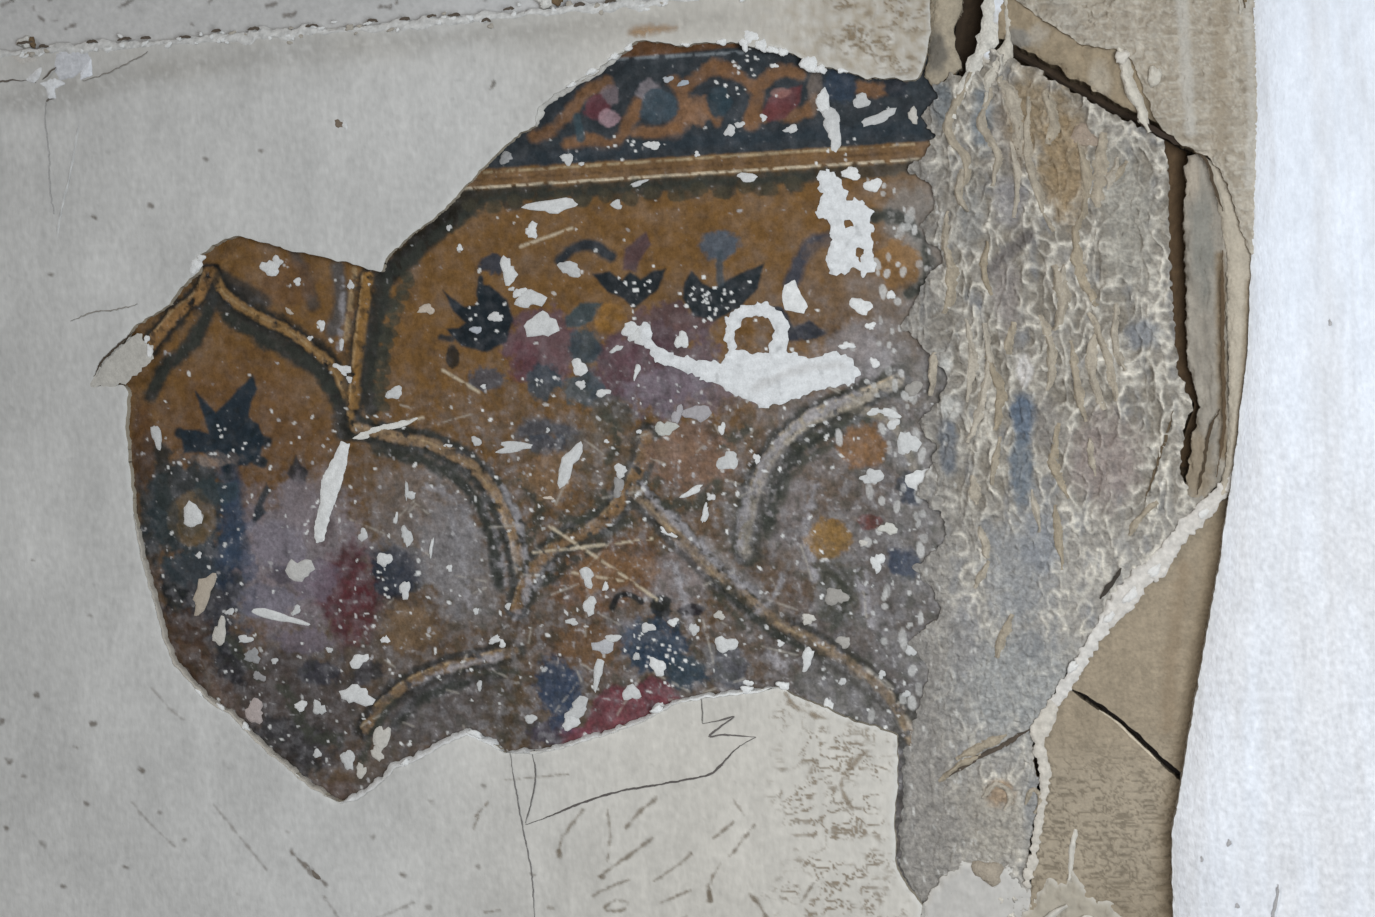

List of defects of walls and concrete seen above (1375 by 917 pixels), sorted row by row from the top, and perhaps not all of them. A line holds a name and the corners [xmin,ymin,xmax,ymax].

peeling [716,30,848,152]
peeling [853,93,918,127]
peeling [90,330,154,388]
peeling [500,255,560,337]
peeling [521,198,578,239]
peeling [610,280,880,408]
peeling [815,167,882,278]
crack [955,0,1229,502]
peeling [314,417,418,543]
peeling [134,514,789,802]
peeling [1023,471,1232,888]
crack [1076,691,1180,776]